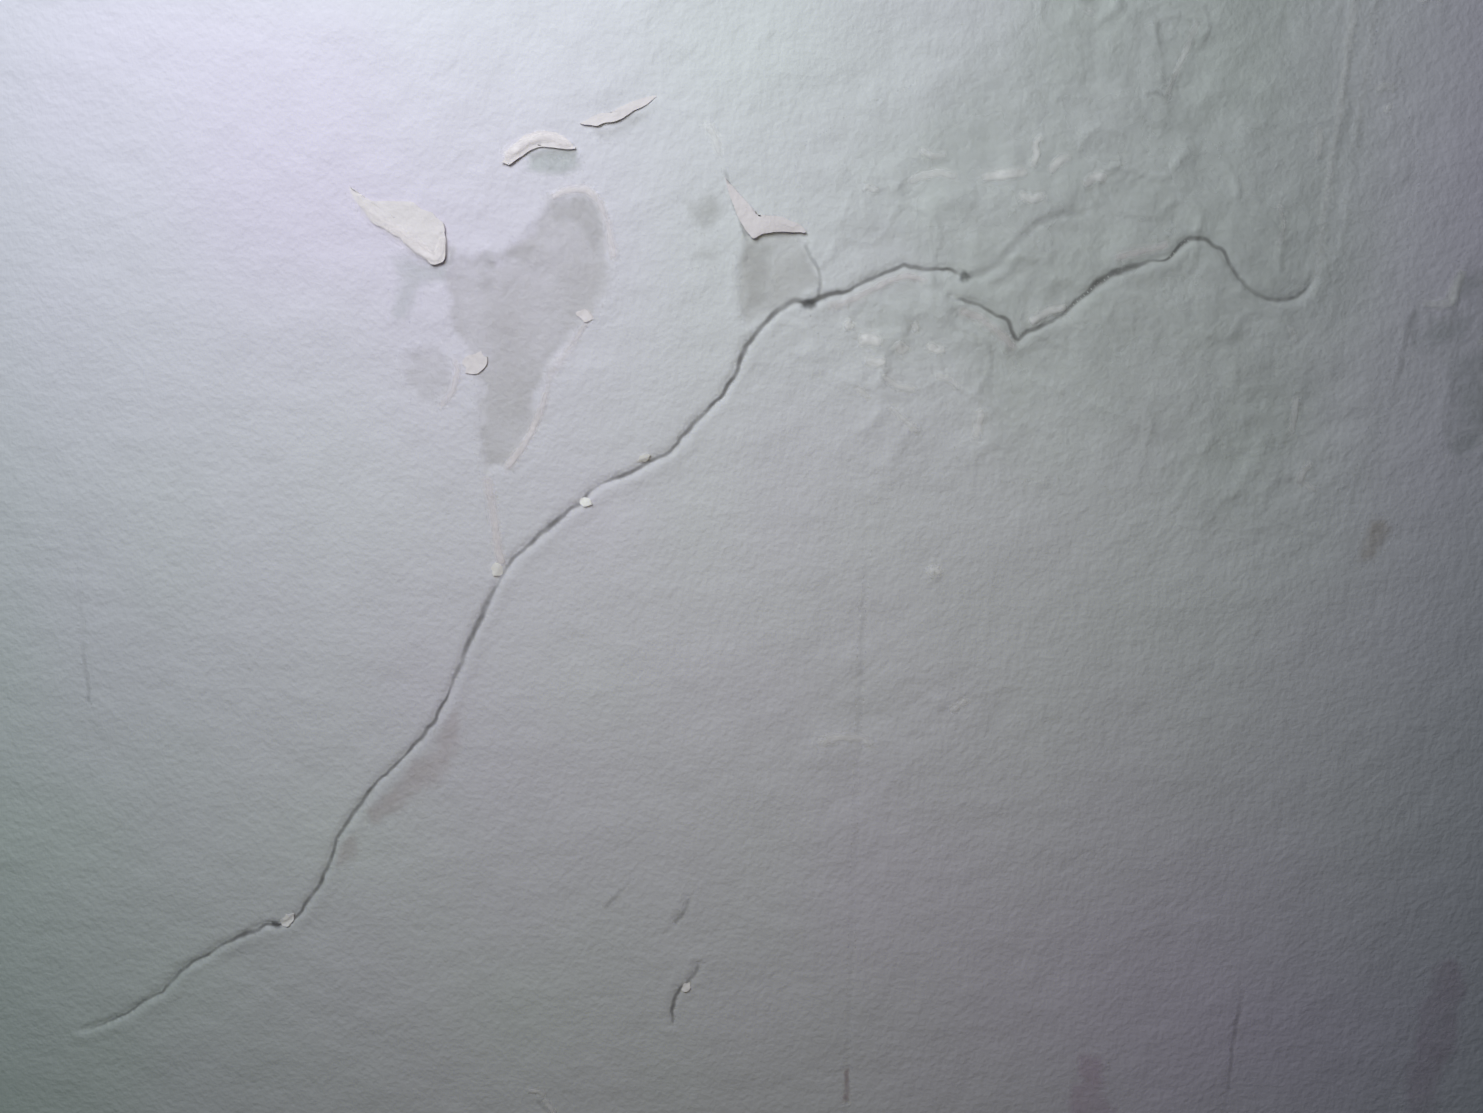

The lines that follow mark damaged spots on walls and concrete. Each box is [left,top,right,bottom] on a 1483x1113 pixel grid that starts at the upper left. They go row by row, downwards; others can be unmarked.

crack [1030,306,1065,328]
crack [685,290,850,433]
crack [618,454,652,478]
crack [491,497,592,576]
crack [280,913,295,927]
crack [679,982,691,992]